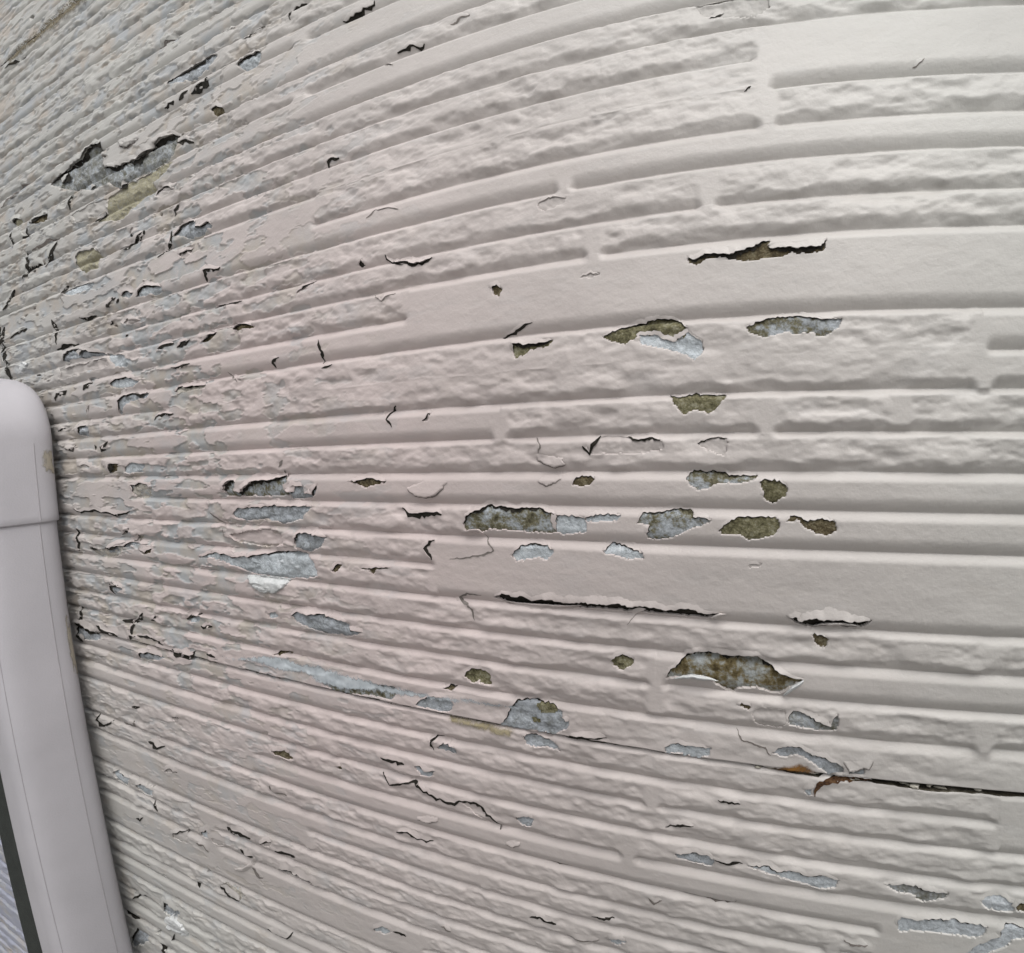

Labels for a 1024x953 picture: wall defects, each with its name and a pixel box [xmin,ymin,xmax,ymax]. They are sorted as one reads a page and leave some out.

peeling [51,129,194,223]
peeling [687,238,827,265]
peeling [602,315,703,360]
peeling [746,312,842,337]
peeling [670,390,726,414]
peeling [602,432,837,559]
peeling [198,472,327,594]
peeling [462,500,621,561]
peeling [665,646,839,730]
peeling [500,694,606,750]
crack [811,772,872,796]
peeling [883,874,1024,953]